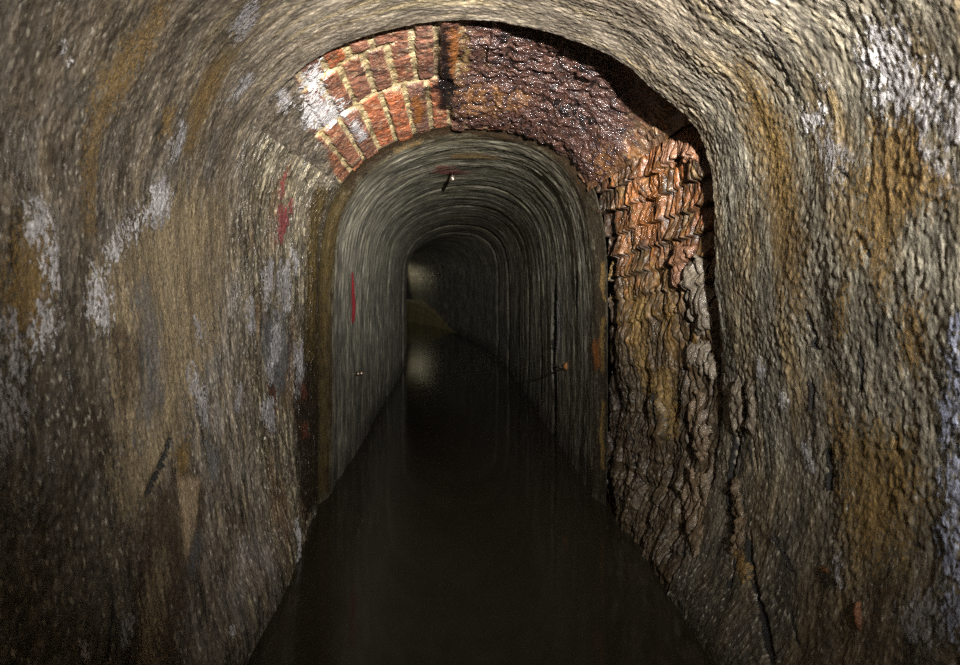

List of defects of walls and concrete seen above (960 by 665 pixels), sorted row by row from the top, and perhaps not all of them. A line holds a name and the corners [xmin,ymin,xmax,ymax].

rust [448,28,474,77]
water stain [801,73,849,195]
water stain [853,15,960,198]
water stain [246,21,640,507]
crack [726,388,800,665]